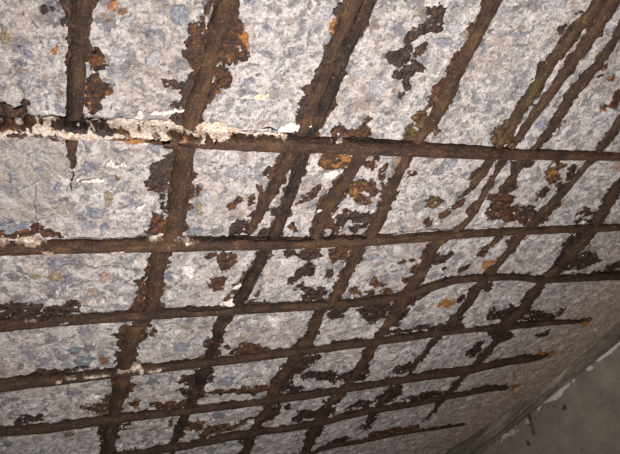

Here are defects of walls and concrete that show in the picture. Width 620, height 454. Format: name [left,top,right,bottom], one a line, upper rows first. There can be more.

rust [0,0,250,240]
rust [226,153,298,237]
damp [278,122,300,133]
spalling [0,0,620,315]
rust [280,153,353,237]
rust [294,0,347,137]
rust [320,156,401,238]
rust [385,2,447,99]
rust [423,160,596,230]
rust [120,345,380,454]
spalling [0,272,620,454]
rust [283,242,494,438]